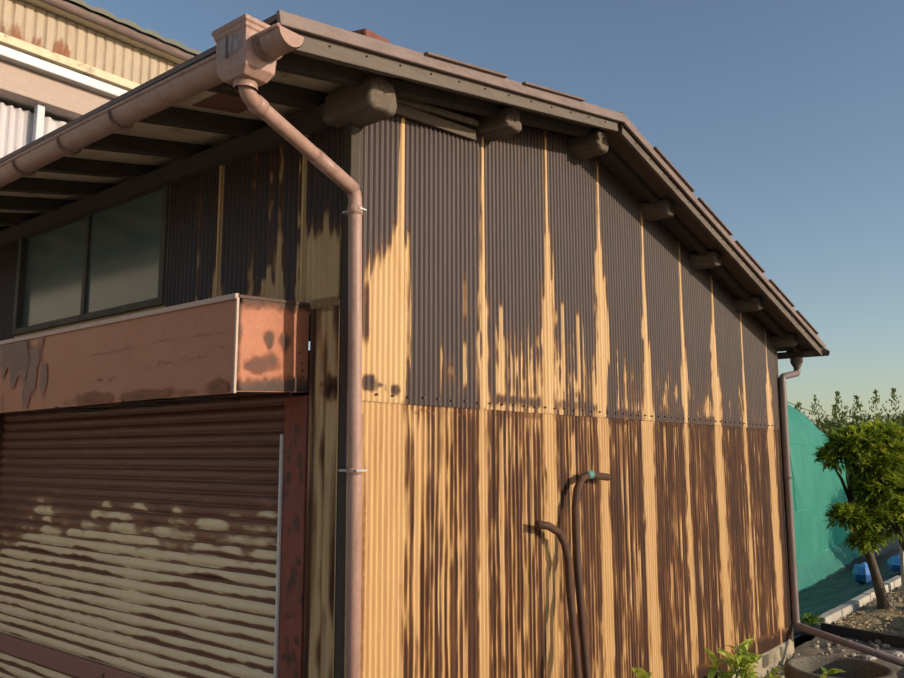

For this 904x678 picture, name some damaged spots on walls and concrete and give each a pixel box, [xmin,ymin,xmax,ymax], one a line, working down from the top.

rust [0,143,342,678]
rust [308,126,343,169]
rust [359,102,790,678]